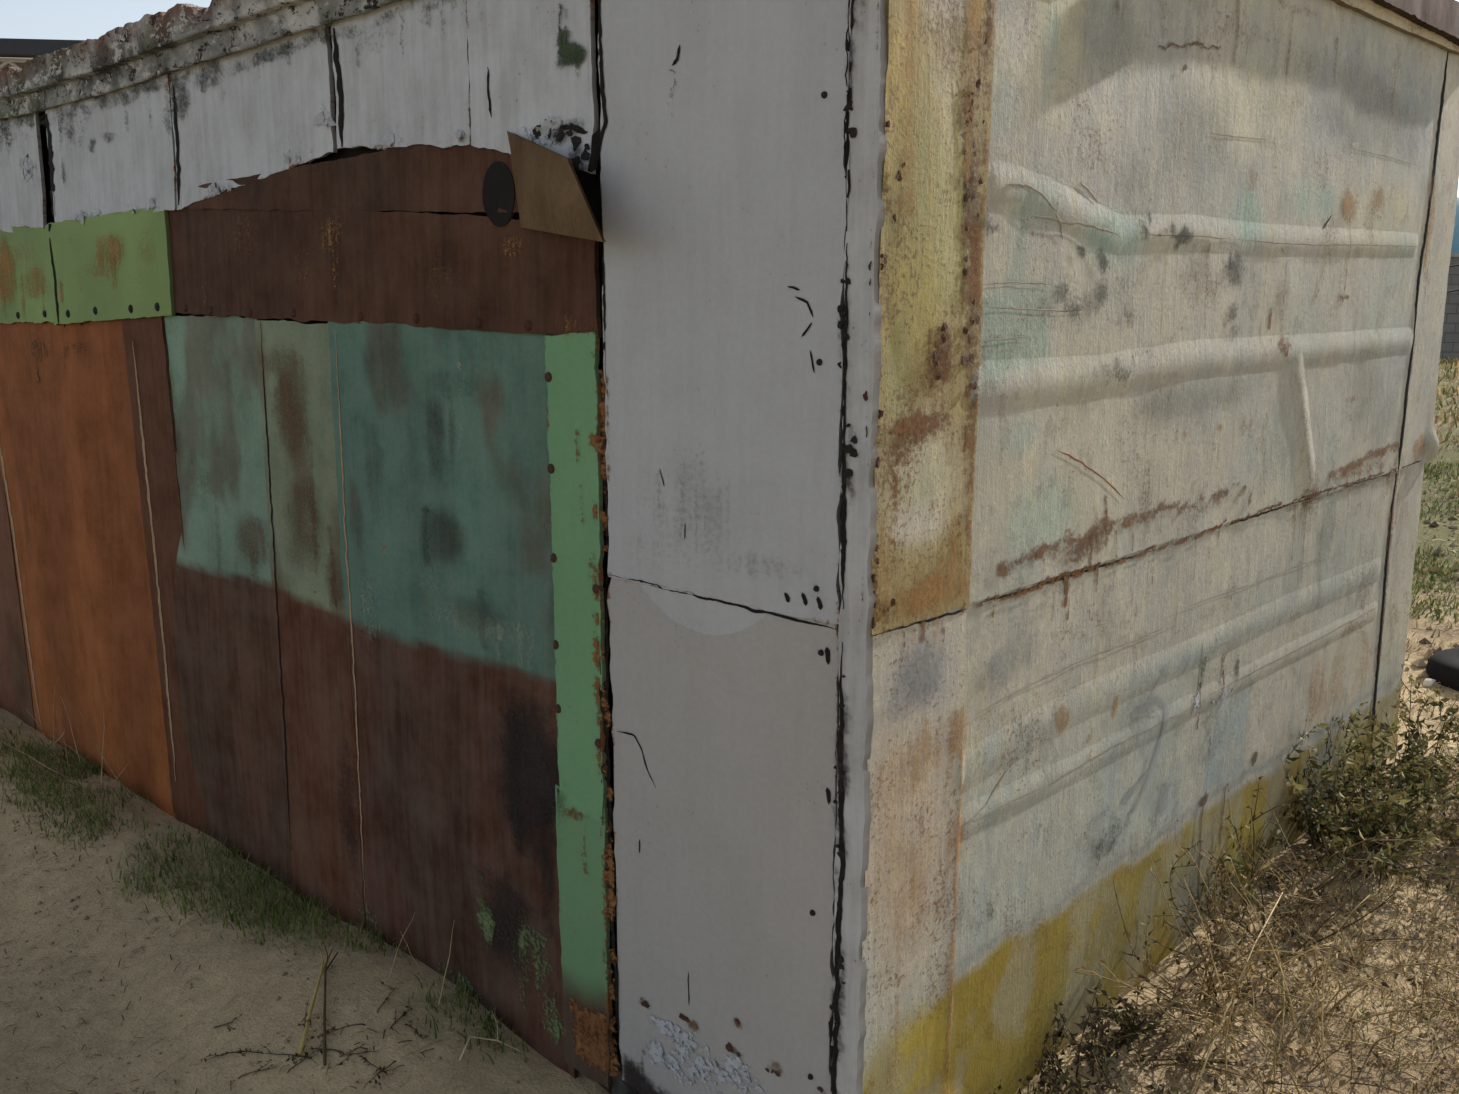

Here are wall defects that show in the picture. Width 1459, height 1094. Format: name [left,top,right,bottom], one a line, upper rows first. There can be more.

rust [890,0,1425,689]
rust [575,352,611,727]
rust [489,702,621,1077]
water stain [622,1057,662,1094]